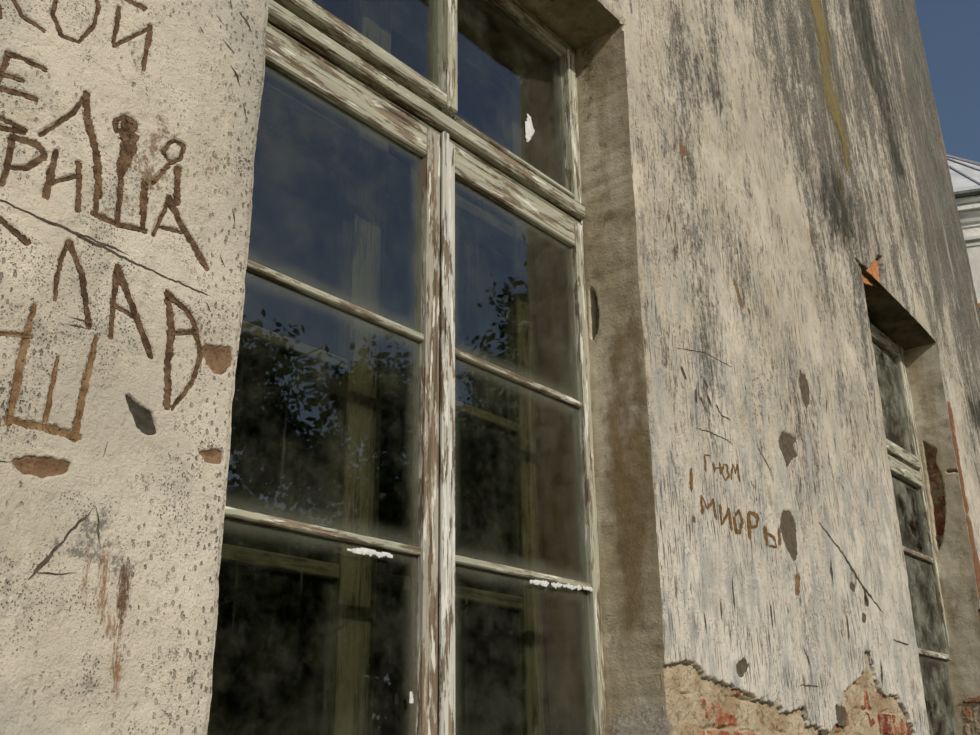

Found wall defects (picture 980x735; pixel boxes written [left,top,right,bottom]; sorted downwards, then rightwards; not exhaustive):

leakage [809,0,867,252]
leakage [846,0,906,182]
crack [0,199,211,312]
flaking render [125,395,156,435]
leakage [965,395,980,441]
flaking render [12,456,70,478]
leakage [607,324,650,628]
crack [704,577,735,631]
flaking render [780,510,798,561]
crack [819,523,884,613]
flaking render [926,444,946,548]
flaking render [661,653,912,735]